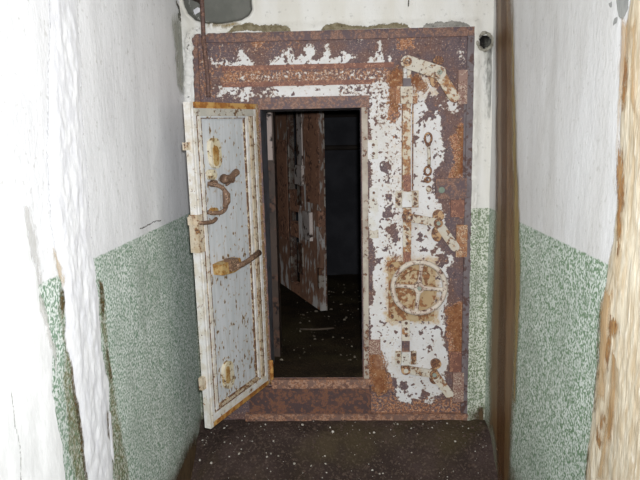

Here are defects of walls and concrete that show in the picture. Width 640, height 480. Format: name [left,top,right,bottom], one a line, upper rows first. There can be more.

spalling [321,22,409,30]
rust [386,65,403,112]
rust [411,75,428,95]
rust [446,303,462,352]
rust [369,351,389,398]